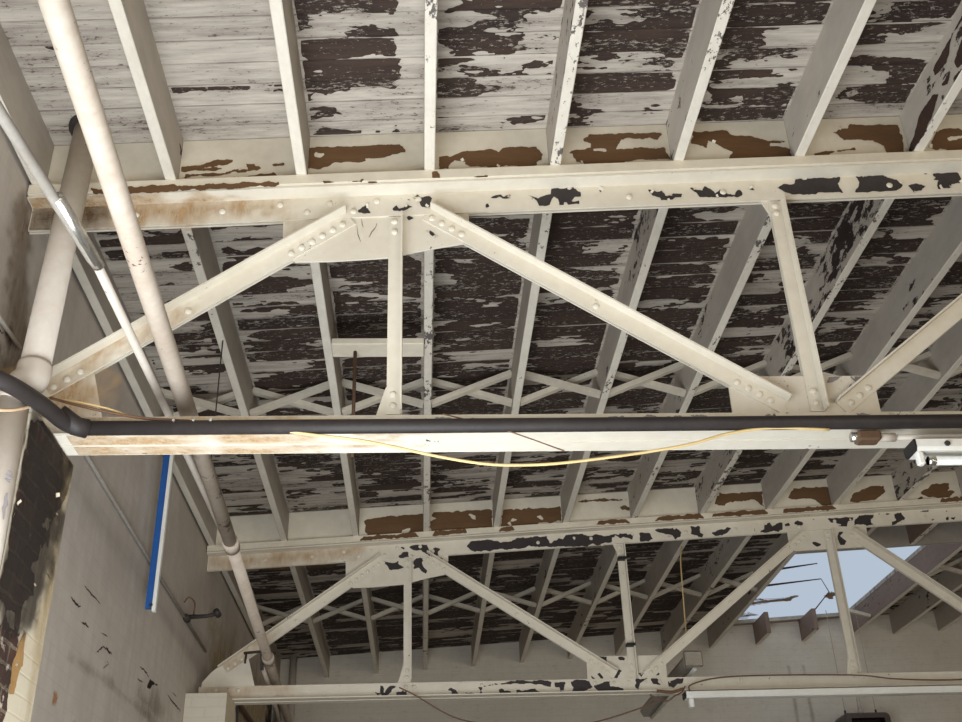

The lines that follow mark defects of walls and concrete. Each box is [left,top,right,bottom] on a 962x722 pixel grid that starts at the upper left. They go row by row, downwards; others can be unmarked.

peeling [294,0,406,169]
peeling [437,0,562,98]
peeling [567,0,700,164]
peeling [691,0,831,159]
rust [82,196,108,223]
rust [134,196,206,223]
peeling [402,230,522,419]
peeling [531,187,639,298]
peeling [778,172,962,387]
damp [0,416,70,635]
peeling [319,449,875,655]
damp [236,704,281,722]